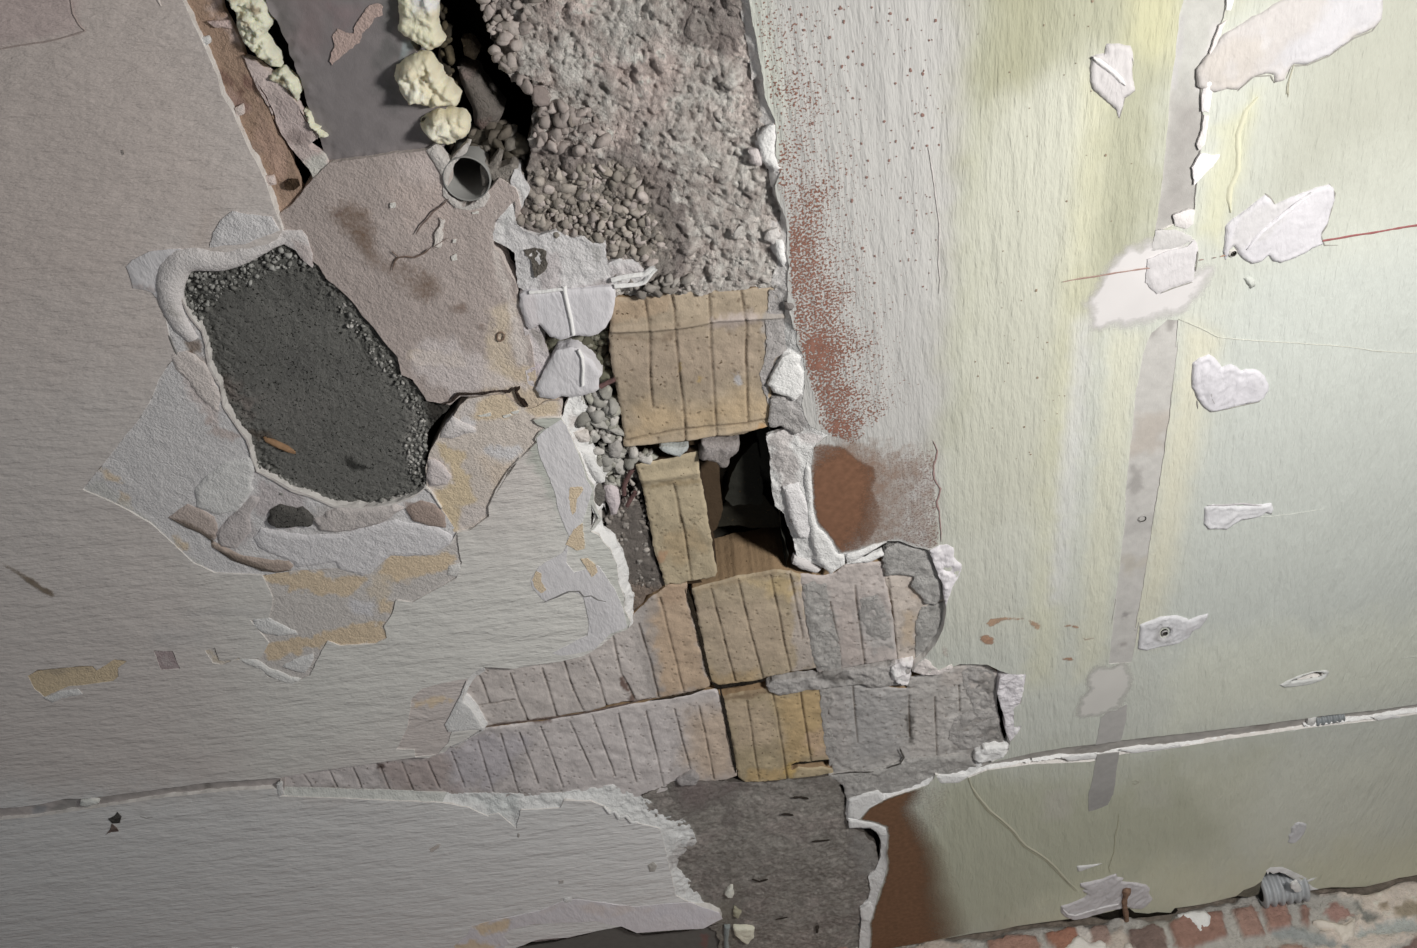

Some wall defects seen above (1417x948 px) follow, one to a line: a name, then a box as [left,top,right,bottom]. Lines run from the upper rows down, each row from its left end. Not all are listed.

spalling [434,0,887,574]
rust [756,0,943,552]
peeling [83,305,635,684]
peeling [933,441,942,535]
peeling [397,667,488,756]
spalling [1292,707,1417,731]
spalling [277,735,1234,948]
rust [862,790,951,948]